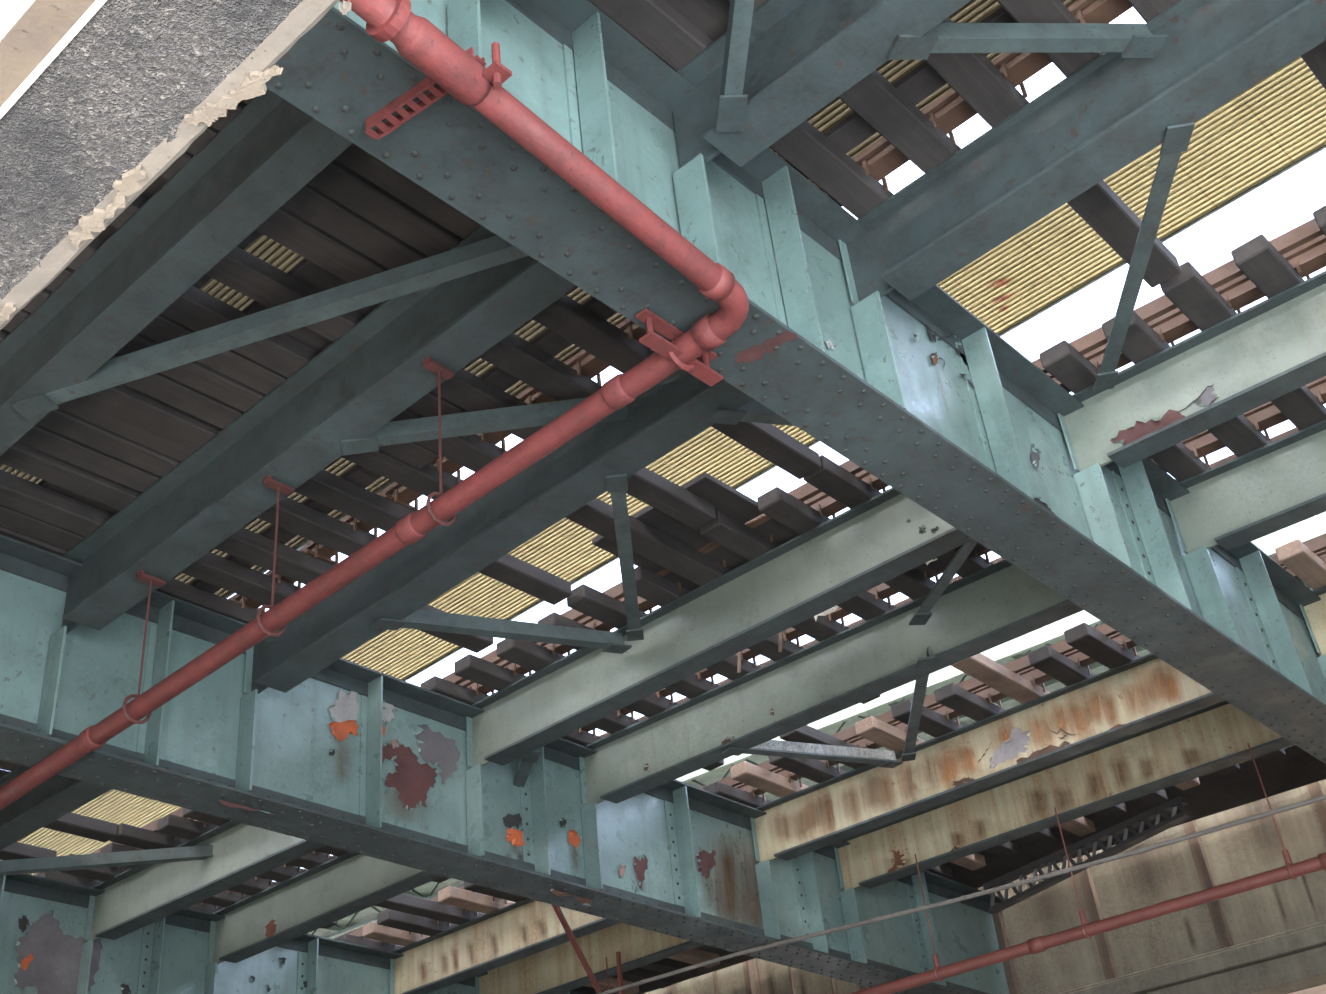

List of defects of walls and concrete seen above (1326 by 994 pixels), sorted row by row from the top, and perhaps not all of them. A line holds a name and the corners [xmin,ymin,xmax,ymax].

peeling [1195,386,1217,407]
peeling [328,690,359,756]
peeling [382,700,460,811]
peeling [990,727,1032,769]
corrosion [1016,694,1124,764]
peeling [502,813,526,848]
peeling [696,850,716,878]
corrosion [887,849,906,873]
peeling [14,909,103,994]